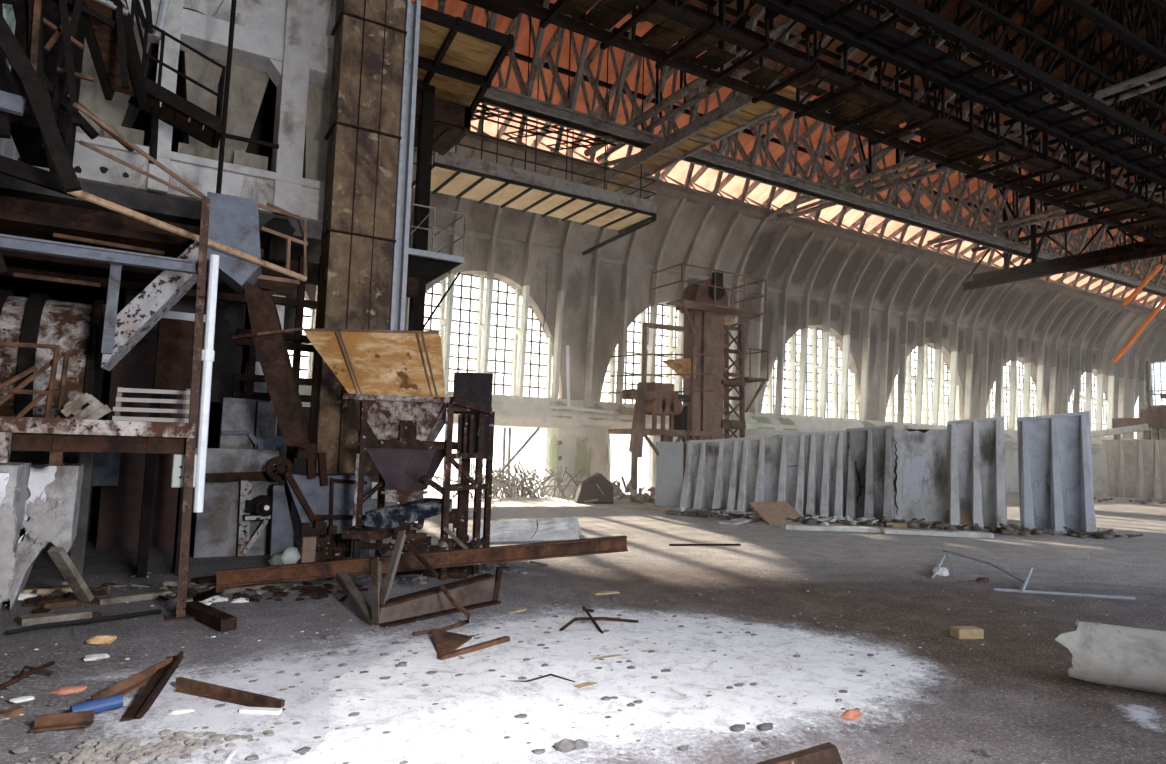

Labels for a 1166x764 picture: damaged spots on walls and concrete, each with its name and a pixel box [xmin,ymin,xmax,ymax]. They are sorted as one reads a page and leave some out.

spalling [0,466,68,604]